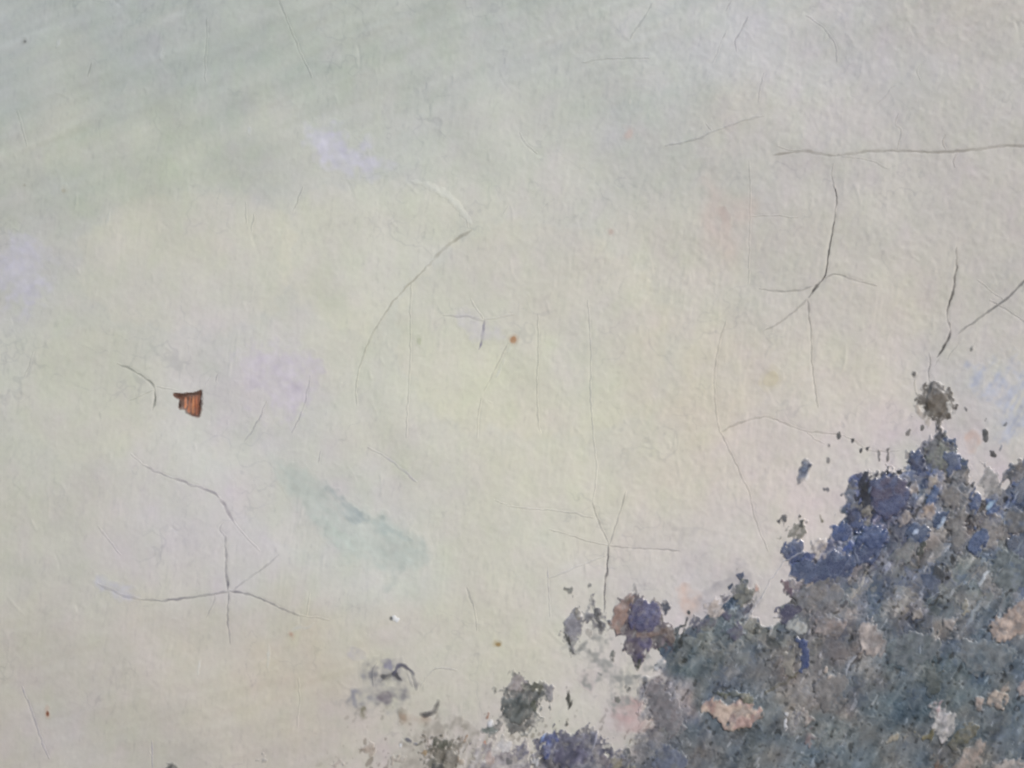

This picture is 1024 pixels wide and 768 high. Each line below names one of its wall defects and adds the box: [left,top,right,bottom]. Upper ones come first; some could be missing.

crack [98,453,330,645]
crack [549,300,680,613]
peeling [399,371,1024,768]
crack [713,113,1024,551]